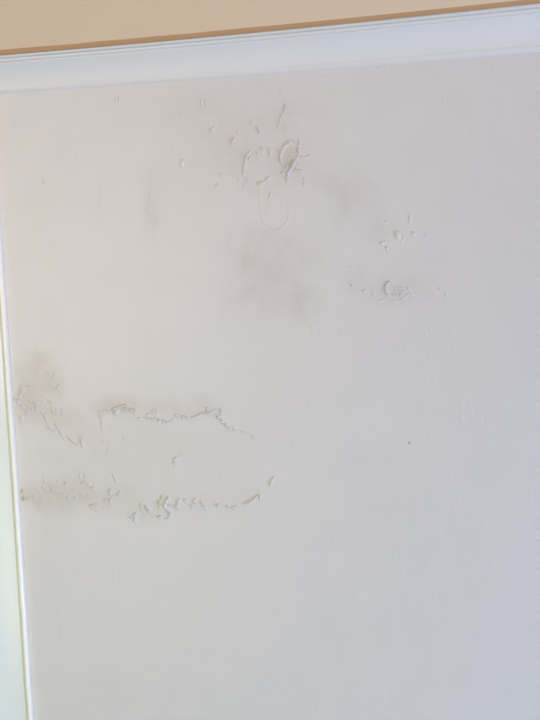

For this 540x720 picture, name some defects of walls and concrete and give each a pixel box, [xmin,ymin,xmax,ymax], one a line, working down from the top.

peeling [268,138,313,187]